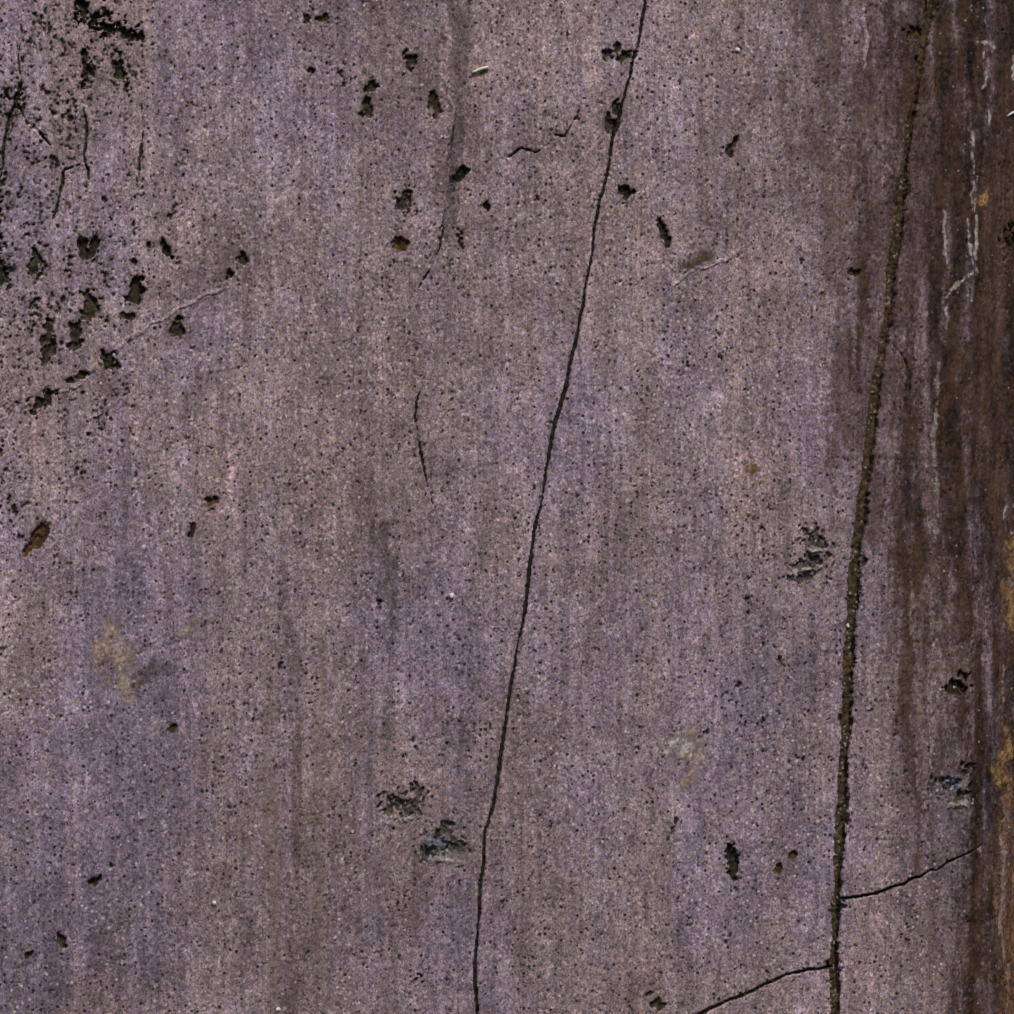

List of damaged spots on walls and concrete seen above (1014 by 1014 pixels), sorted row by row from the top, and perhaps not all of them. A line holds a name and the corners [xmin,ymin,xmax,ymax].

spalling [71,0,145,97]
spalling [358,78,380,125]
spalling [427,90,442,119]
spalling [26,241,47,281]
spalling [77,223,100,261]
spalling [146,237,174,260]
spalling [39,258,146,366]
spalling [169,315,191,340]
spalling [26,371,89,415]
crack [473,0,647,1014]
crack [696,0,972,1014]
damp [883,0,1014,1014]